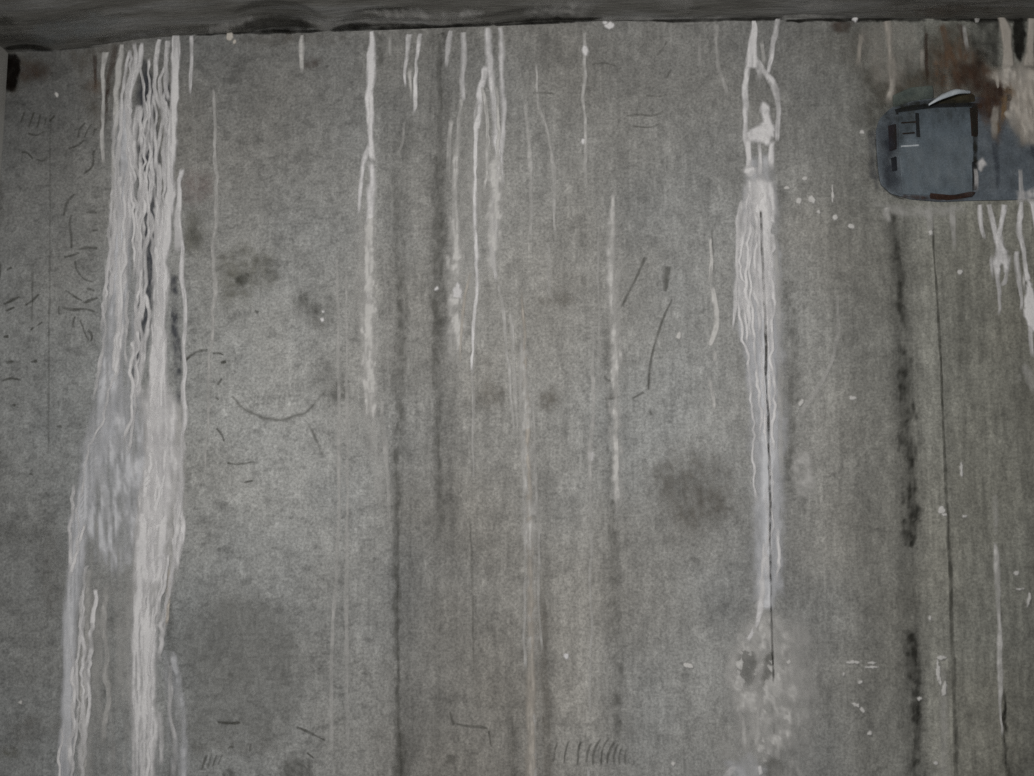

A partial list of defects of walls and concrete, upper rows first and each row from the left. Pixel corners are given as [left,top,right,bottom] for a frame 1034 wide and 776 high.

efflorescence [403,34,421,111]
water stain [992,18,1034,143]
water stain [57,35,193,776]
efflorescence [337,31,383,418]
water stain [445,28,542,776]
efflorescence [709,239,720,361]
efflorescence [727,14,820,776]
water stain [978,174,1034,354]
water stain [994,545,1007,742]